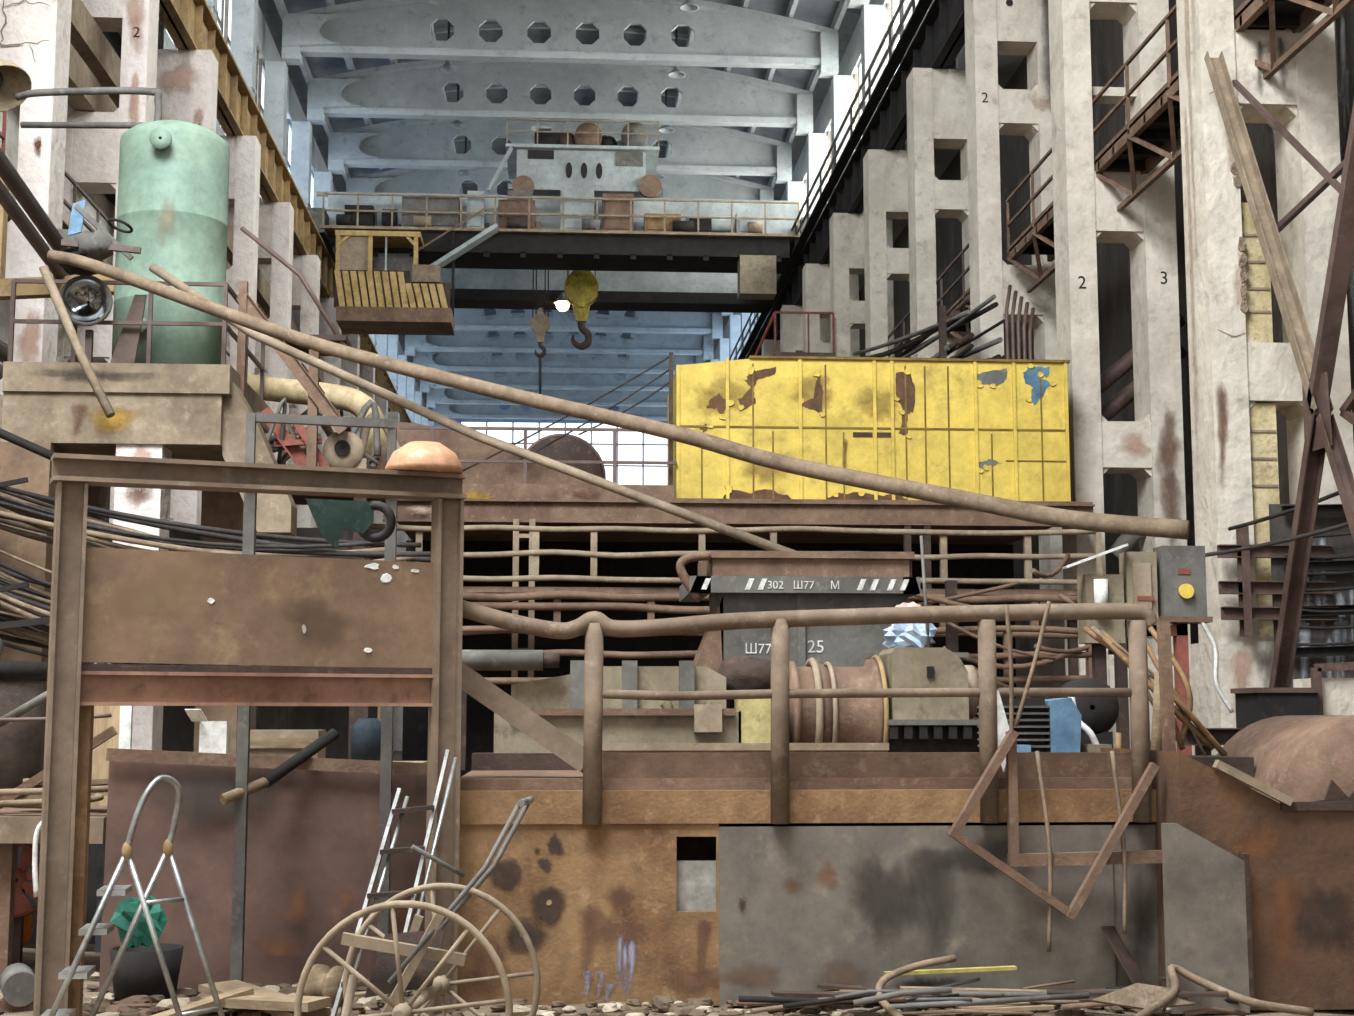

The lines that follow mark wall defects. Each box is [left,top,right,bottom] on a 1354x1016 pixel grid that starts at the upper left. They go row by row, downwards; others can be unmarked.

crack [0,0,49,61]
rust [1126,417,1178,519]